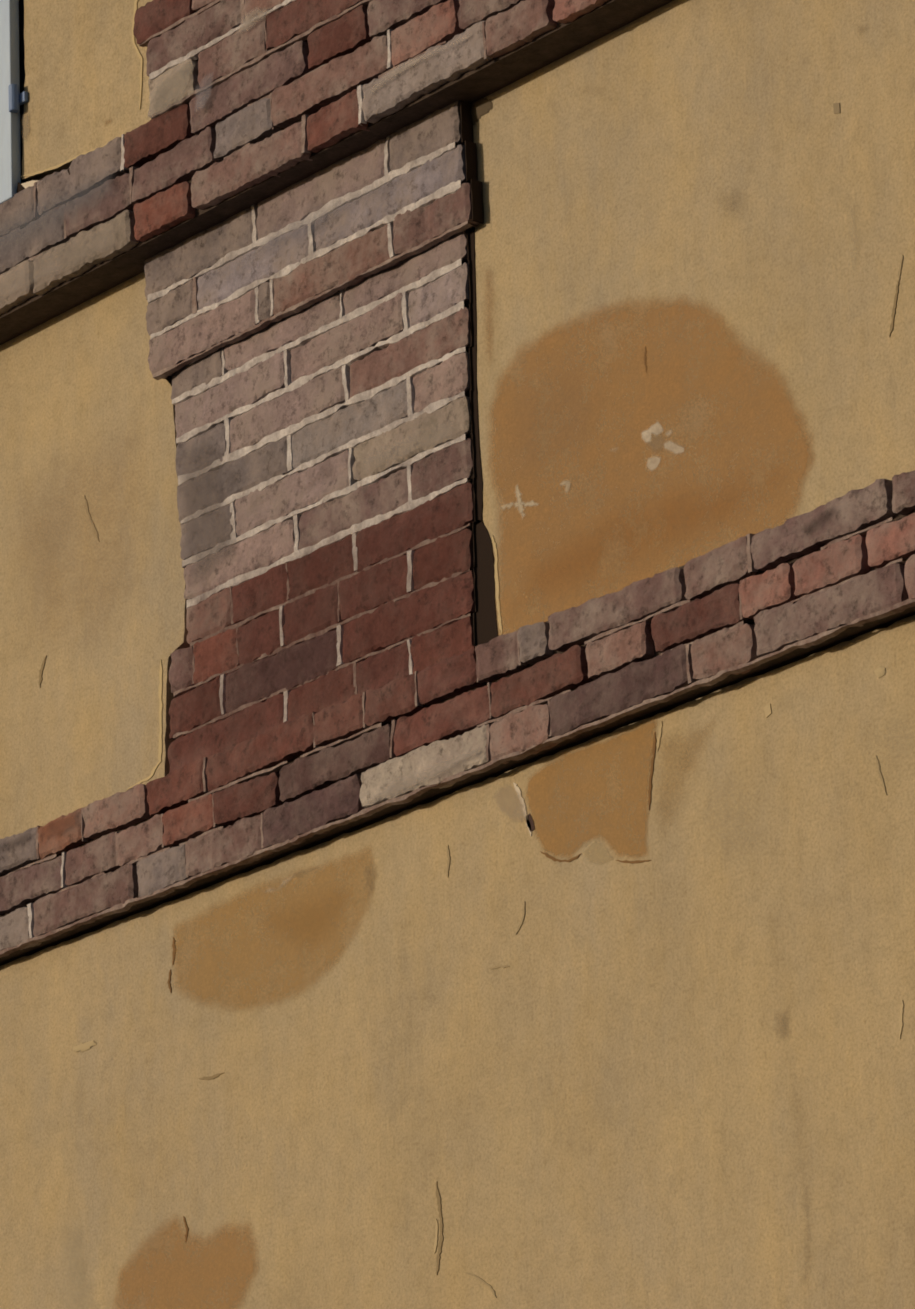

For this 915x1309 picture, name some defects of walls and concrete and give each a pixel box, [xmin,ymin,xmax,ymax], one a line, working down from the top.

damp [492,304,809,634]
peeling [513,721,663,864]